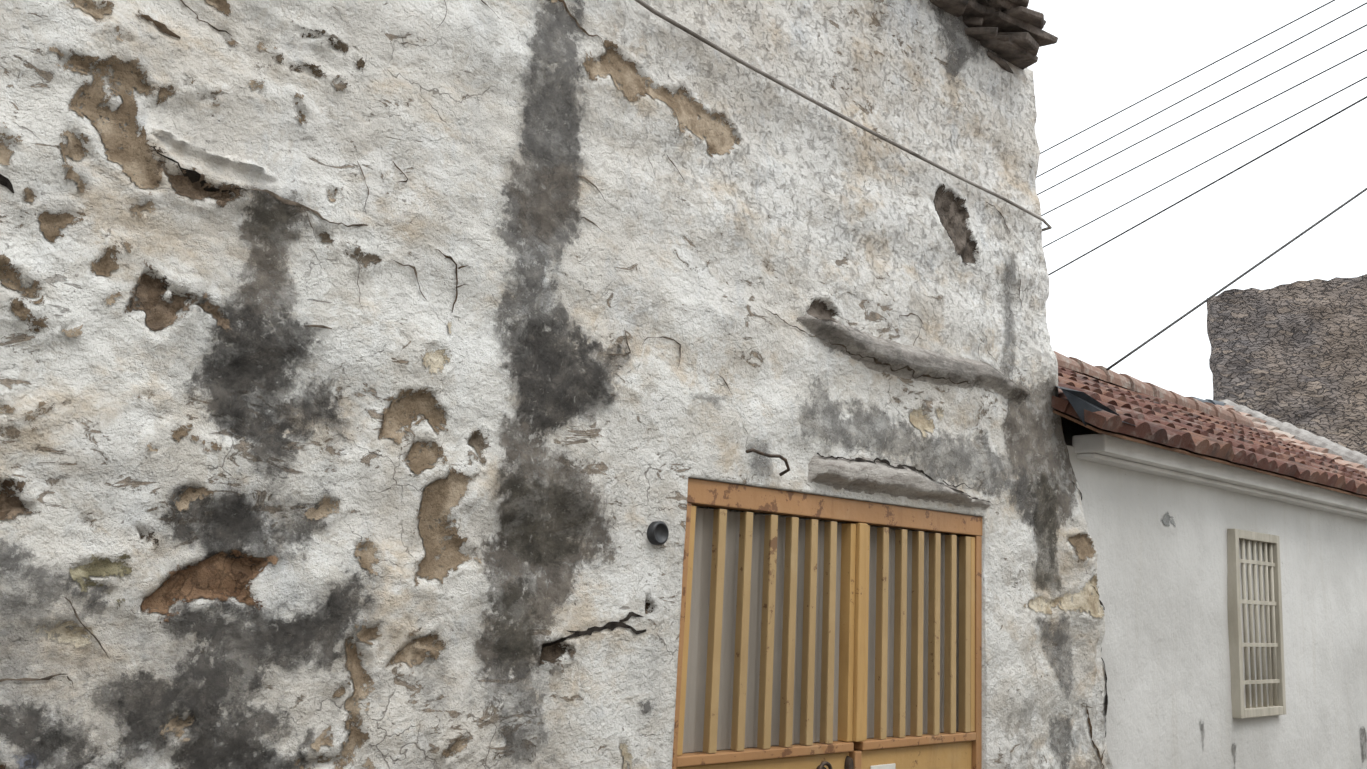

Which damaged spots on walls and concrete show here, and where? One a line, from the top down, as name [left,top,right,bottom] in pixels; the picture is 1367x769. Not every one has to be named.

peeling [49,0,243,222]
peeling [582,40,743,157]
peeling [23,187,86,249]
peeling [933,184,979,266]
damp [0,538,110,608]
damp [0,570,375,769]
damp [187,186,341,481]
peeling [379,322,491,587]
damp [471,0,630,760]
crack [542,612,646,651]
damp [802,377,1078,594]
damp [1038,614,1075,694]